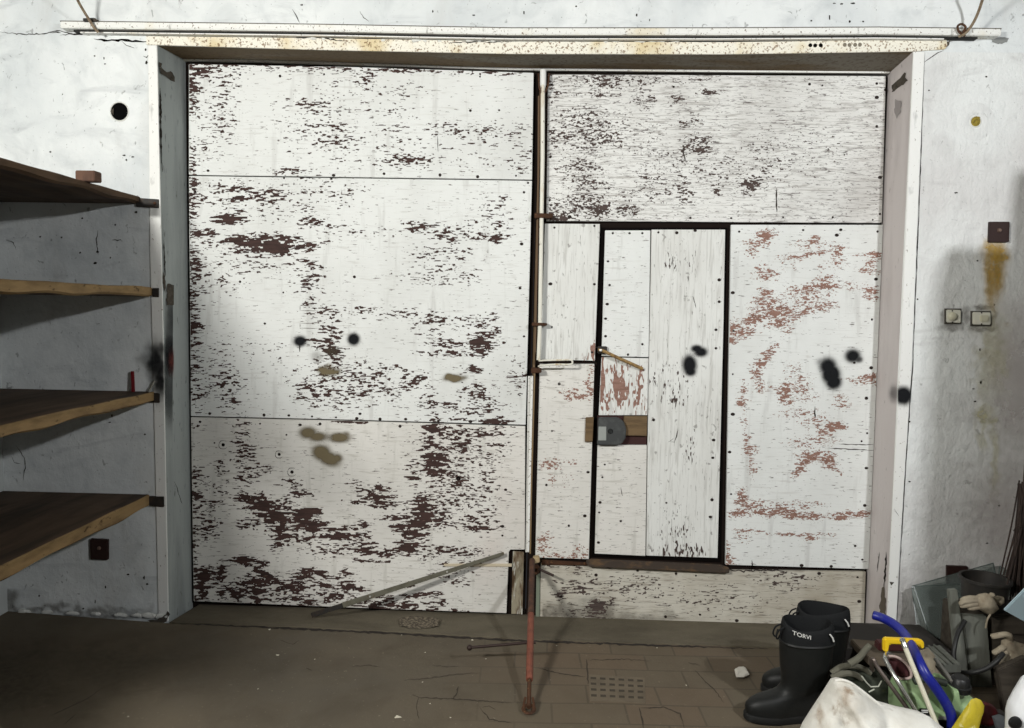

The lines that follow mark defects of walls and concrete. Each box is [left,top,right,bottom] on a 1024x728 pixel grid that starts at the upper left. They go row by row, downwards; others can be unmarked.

crack [2,30,148,58]
peeling [547,74,845,221]
peeling [189,64,533,612]
peeling [726,228,882,565]
rust [985,244,1009,286]
peeling [536,531,822,618]